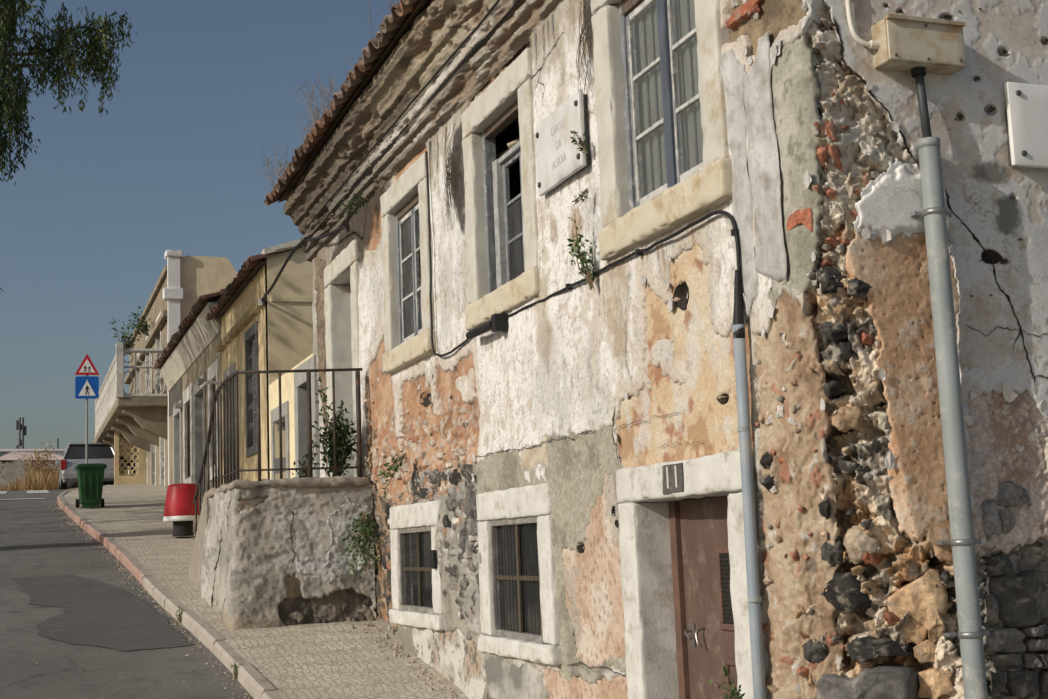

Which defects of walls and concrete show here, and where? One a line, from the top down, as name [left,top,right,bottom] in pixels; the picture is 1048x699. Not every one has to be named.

leakage [429,125,466,232]
spalling [613,0,965,699]
crack [945,189,1048,390]
crack [286,507,296,577]
flaking render [278,341,486,699]
flaking render [542,473,628,699]
flaking render [963,382,1048,699]